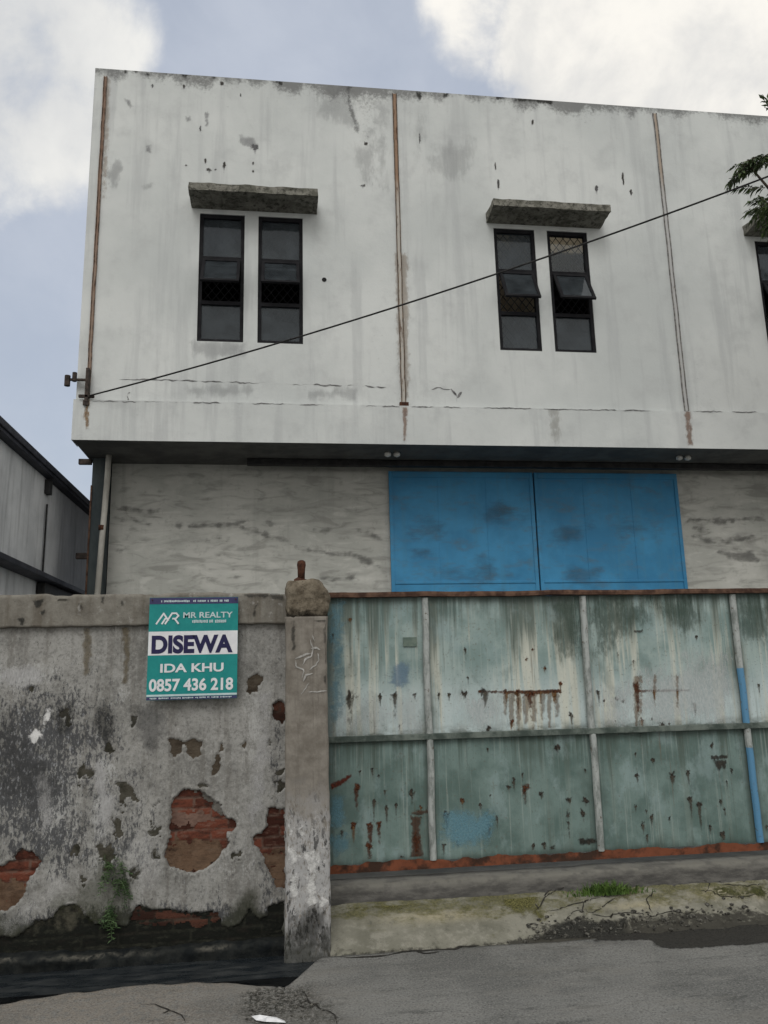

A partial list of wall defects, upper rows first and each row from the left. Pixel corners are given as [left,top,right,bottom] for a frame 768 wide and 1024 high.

spalling [246,673,263,695]
corrosion [438,677,563,707]
corrosion [596,682,689,726]
water stain [29,709,51,744]
spalling [168,738,202,759]
corrosion [331,768,380,806]
spalling [147,744,243,872]
corrosion [341,790,398,856]
corrosion [400,789,428,857]
spalling [0,807,328,953]
crack [534,880,768,920]